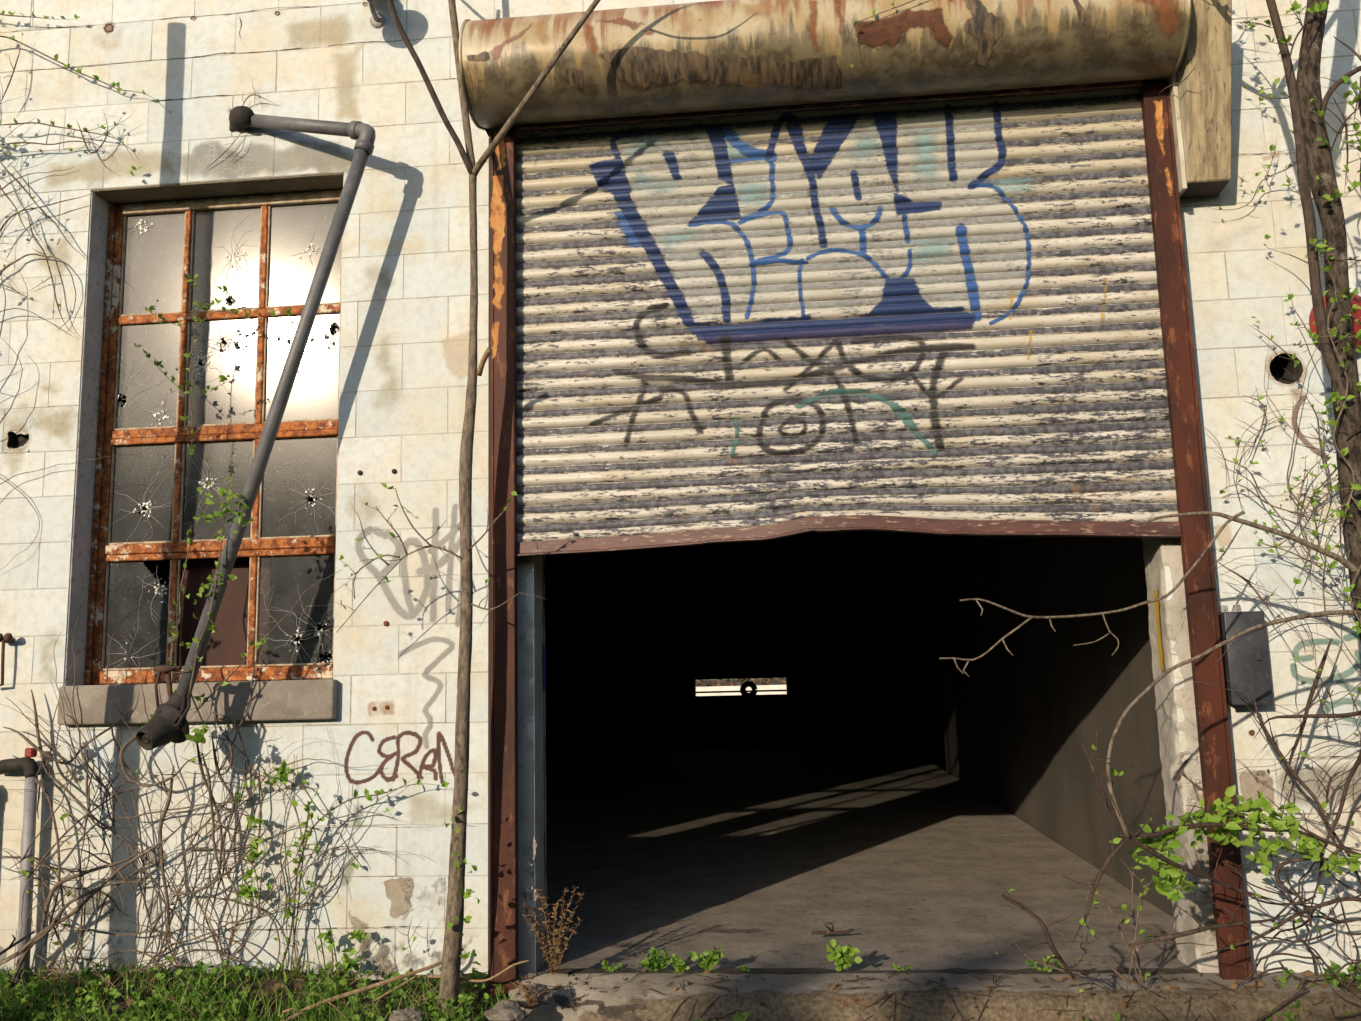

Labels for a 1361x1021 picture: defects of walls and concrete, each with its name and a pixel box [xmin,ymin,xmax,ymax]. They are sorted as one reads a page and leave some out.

corrosion [587,25,597,53]
corrosion [809,0,818,50]
peeling [384,877,425,918]